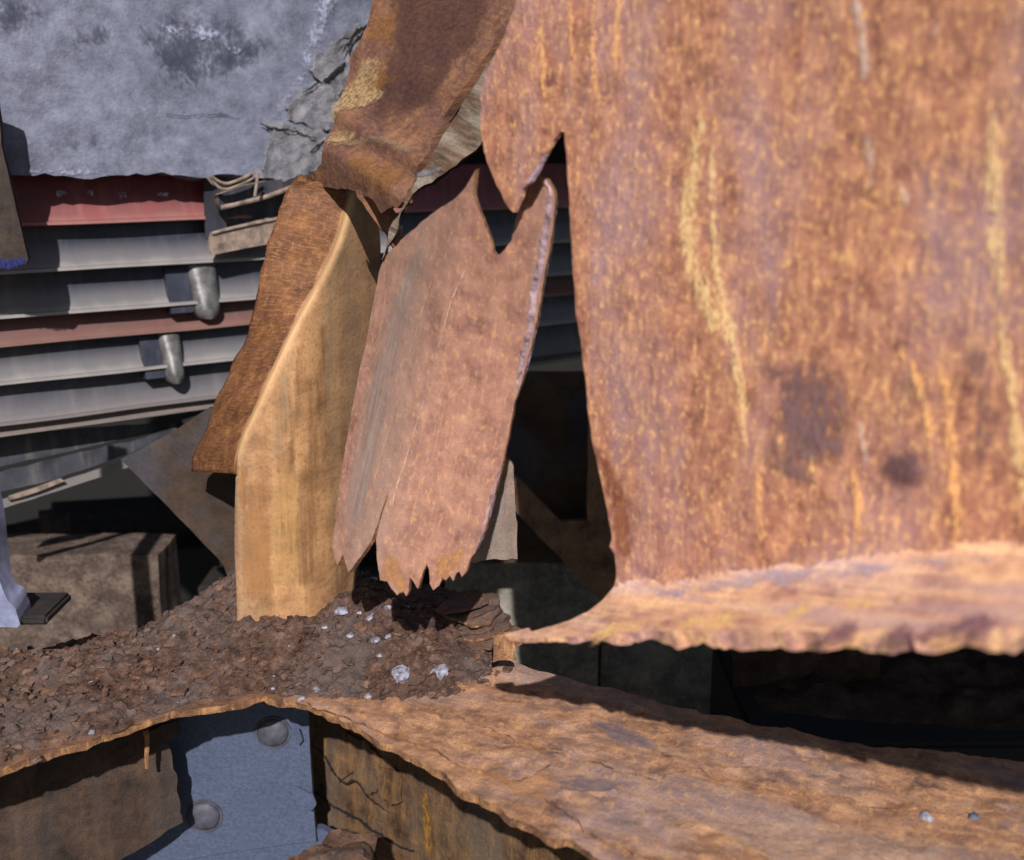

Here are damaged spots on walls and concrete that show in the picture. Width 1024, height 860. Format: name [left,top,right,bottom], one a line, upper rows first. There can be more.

crack [303,25,367,101]
rust [355,190,403,249]
rust [986,121,1005,290]
rust [680,116,746,442]
rust [883,453,922,483]
rust [901,351,933,450]
rust [940,372,960,538]
rust [999,321,1024,500]
rust [435,592,523,658]
rust [731,647,880,691]
crack [313,745,414,852]
rust [301,699,1006,860]